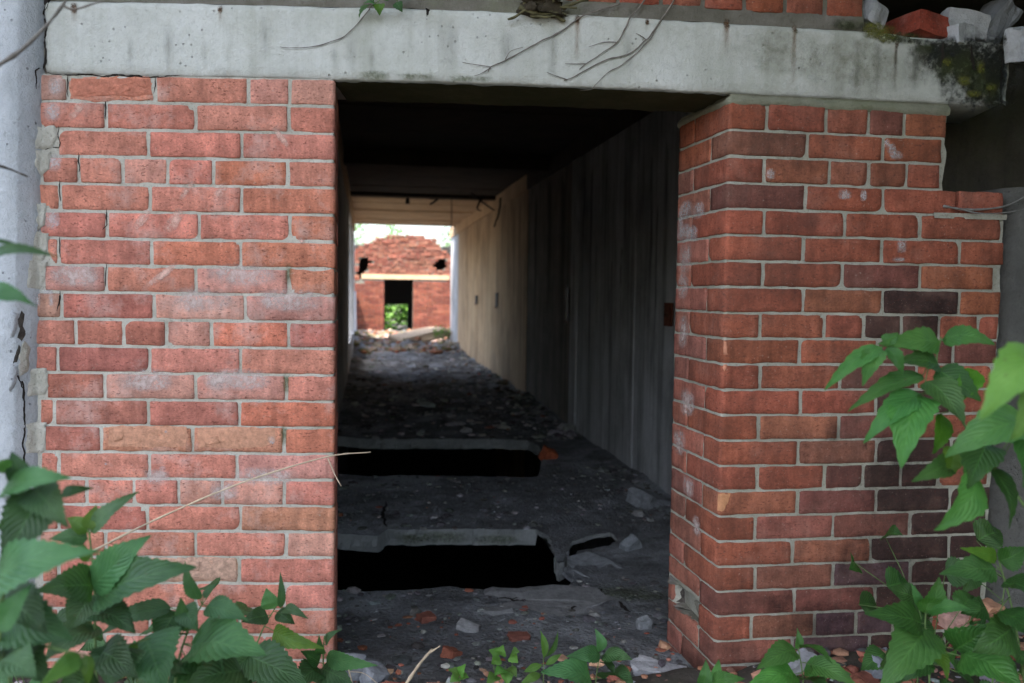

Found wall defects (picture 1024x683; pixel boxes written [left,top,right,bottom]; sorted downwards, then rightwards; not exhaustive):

crack [13,361,26,462]
spalling [668,575,700,622]